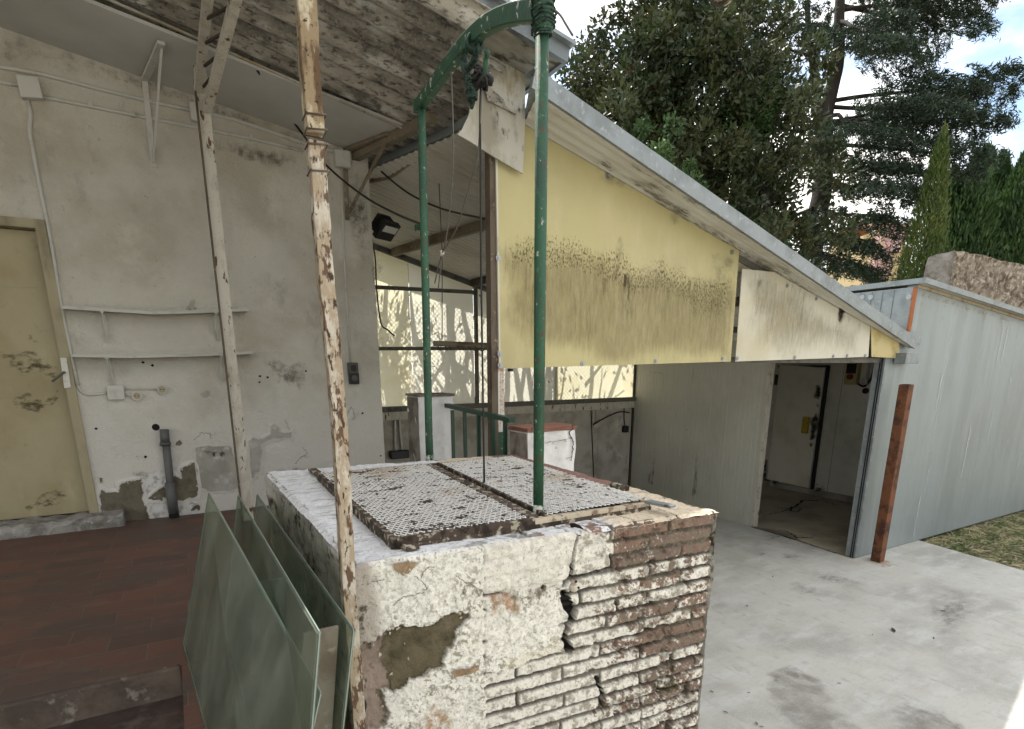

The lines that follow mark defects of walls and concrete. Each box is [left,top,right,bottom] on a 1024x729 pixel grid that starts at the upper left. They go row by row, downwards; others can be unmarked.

peeling [95,423,294,521]
crack [753,500,852,558]
crack [560,523,583,650]
flaking render [360,612,479,729]
crack [594,675,604,709]